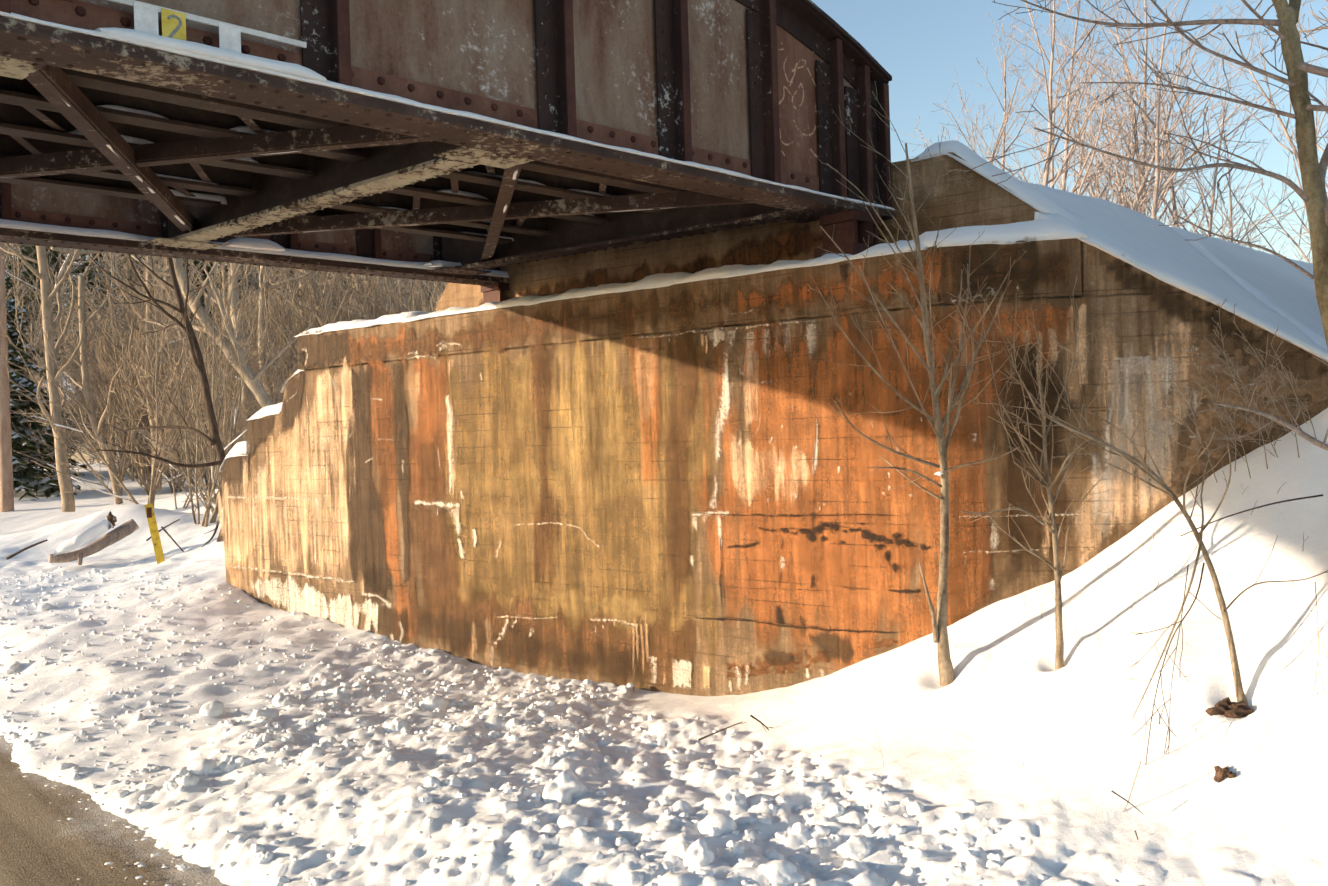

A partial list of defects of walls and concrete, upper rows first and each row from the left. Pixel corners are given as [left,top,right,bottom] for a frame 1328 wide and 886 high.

water stain [218,330,709,691]
corrosion [349,250,1057,667]
water stain [639,310,818,590]
crack [694,512,930,633]
water stain [991,340,1067,568]
water stain [1077,307,1086,386]
water stain [1080,261,1267,566]